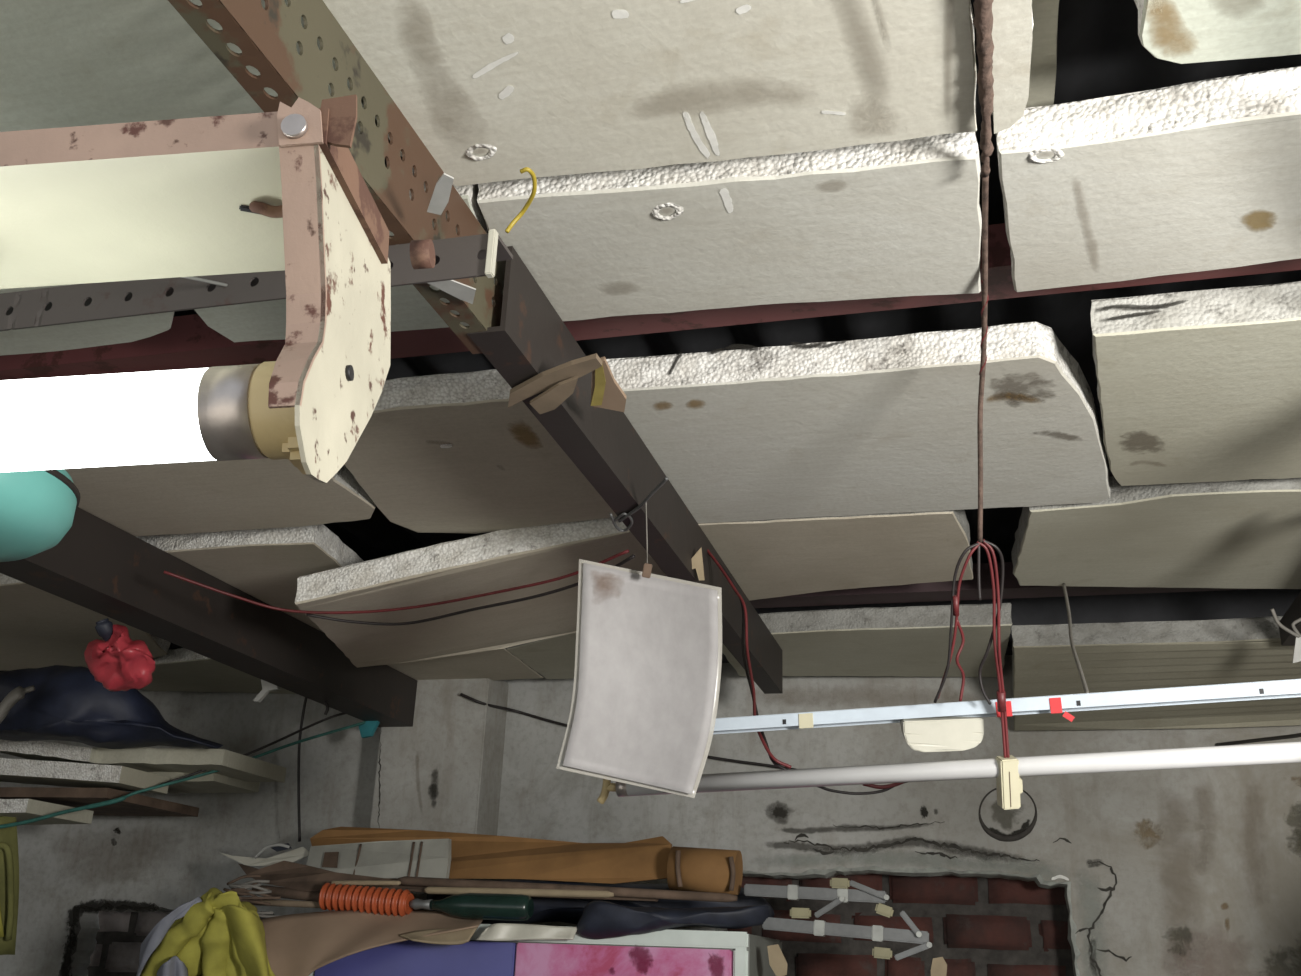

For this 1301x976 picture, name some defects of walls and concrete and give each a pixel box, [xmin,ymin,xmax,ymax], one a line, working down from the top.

damp [1246,212,1272,229]
spalling [715,866,1081,976]
crack [774,822,1132,976]